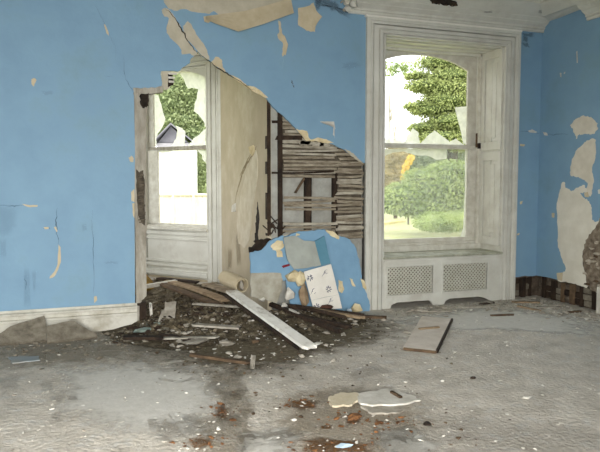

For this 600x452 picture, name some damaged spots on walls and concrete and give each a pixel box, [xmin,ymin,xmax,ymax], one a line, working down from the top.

peeling [162,0,322,72]
peeling [233,76,268,98]
flaking render [131,170,145,225]
spalling [282,121,363,239]
peeling [552,115,600,293]
crack [44,210,61,278]
spalling [248,238,271,253]